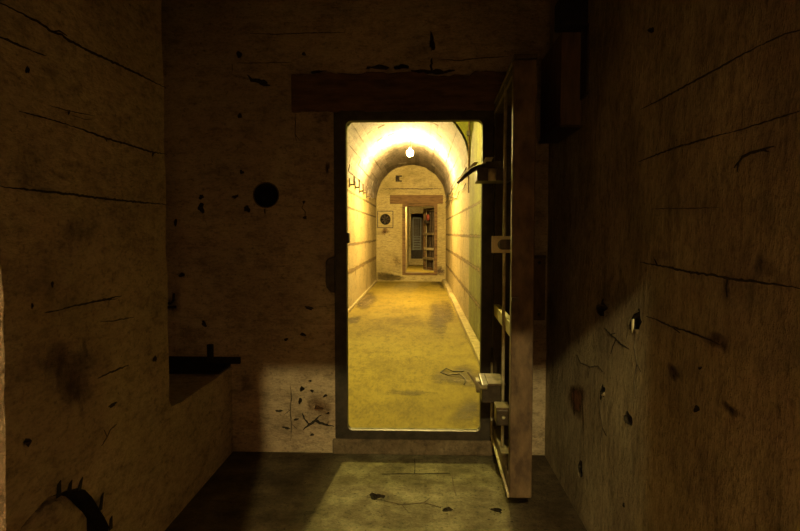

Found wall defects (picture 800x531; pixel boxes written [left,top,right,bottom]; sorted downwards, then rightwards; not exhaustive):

crack [0,3,166,88]
crack [642,30,800,109]
crack [19,105,167,155]
crack [639,111,800,162]
crack [733,146,775,172]
crack [1,186,167,205]
crack [641,259,800,297]
crack [45,296,121,313]
spalling [628,309,642,334]
crack [646,316,720,345]
crack [577,328,641,398]
crack [284,386,334,433]